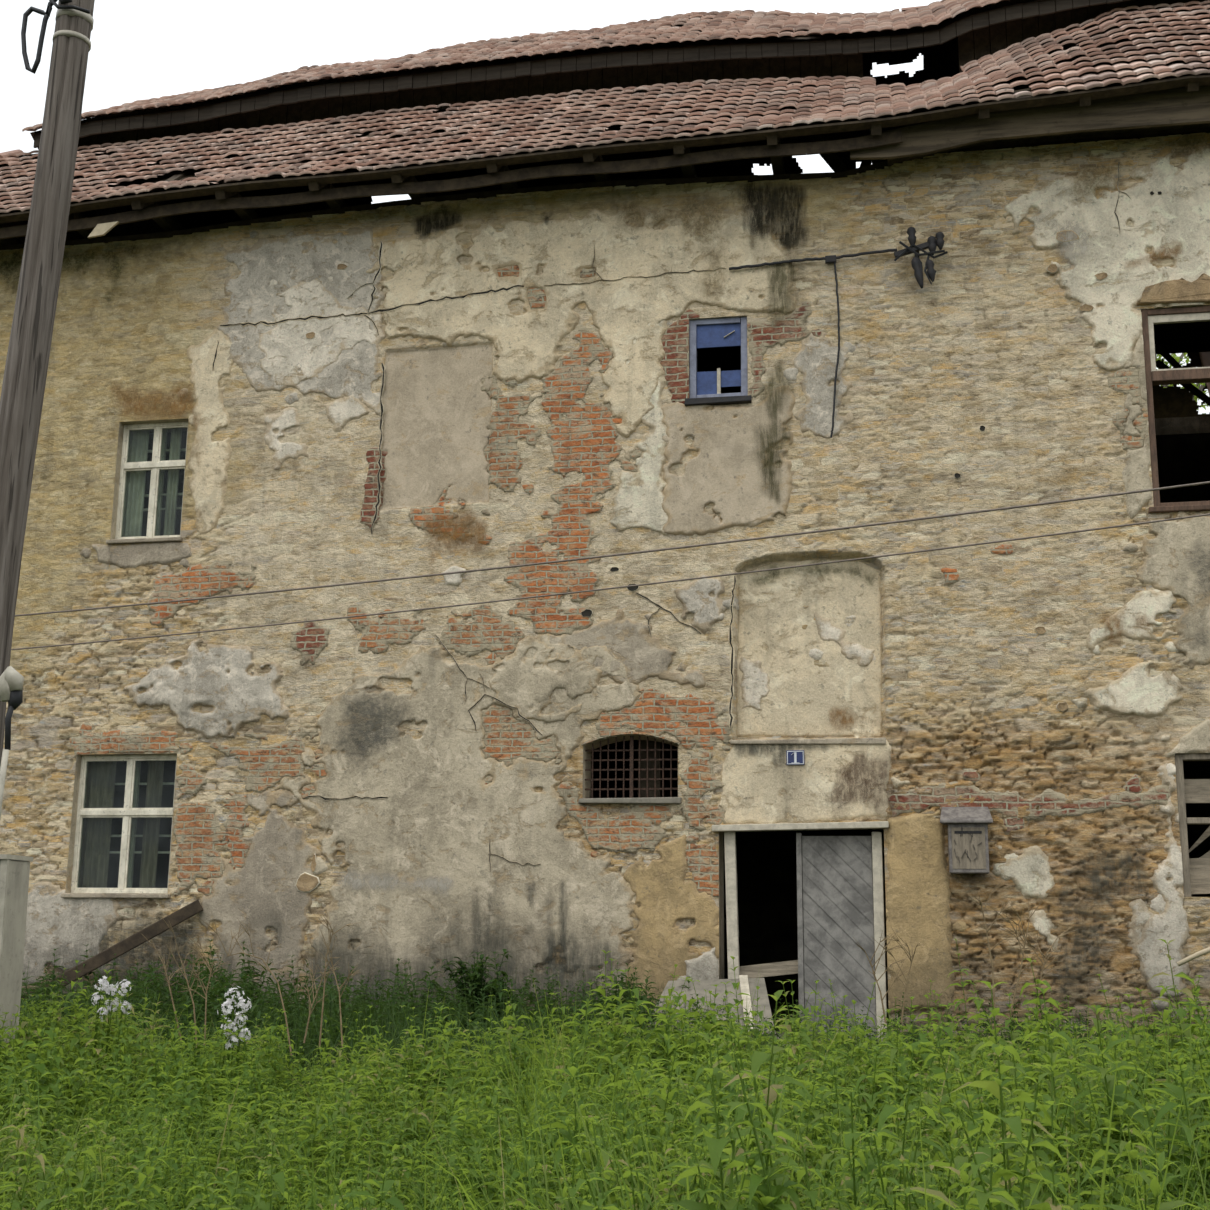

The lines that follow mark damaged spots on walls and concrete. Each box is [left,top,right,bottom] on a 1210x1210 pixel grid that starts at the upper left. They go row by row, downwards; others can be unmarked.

water stain [742,184,805,248]
crack [212,241,726,534]
water stain [760,371,786,489]
flaking render [69,146,1210,1018]
water stain [341,698,398,748]
crack [435,635,542,735]
crack [636,576,737,729]